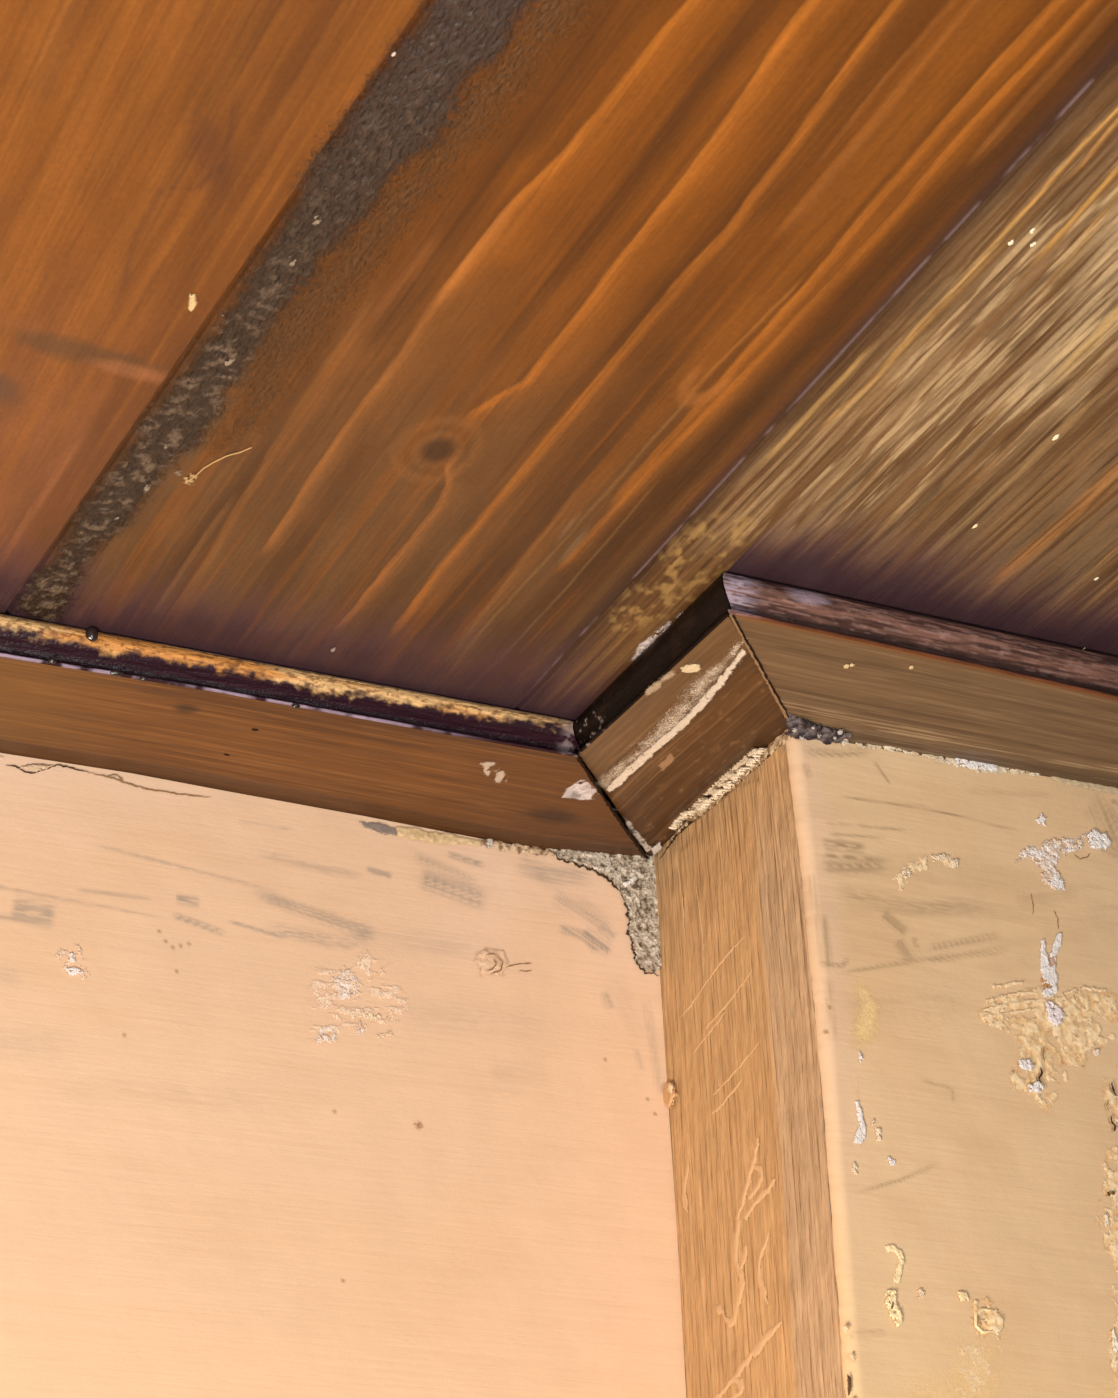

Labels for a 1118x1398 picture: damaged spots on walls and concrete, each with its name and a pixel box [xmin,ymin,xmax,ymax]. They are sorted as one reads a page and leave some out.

water stain [8,0,627,623]
peeling [1041,956,1064,1028]